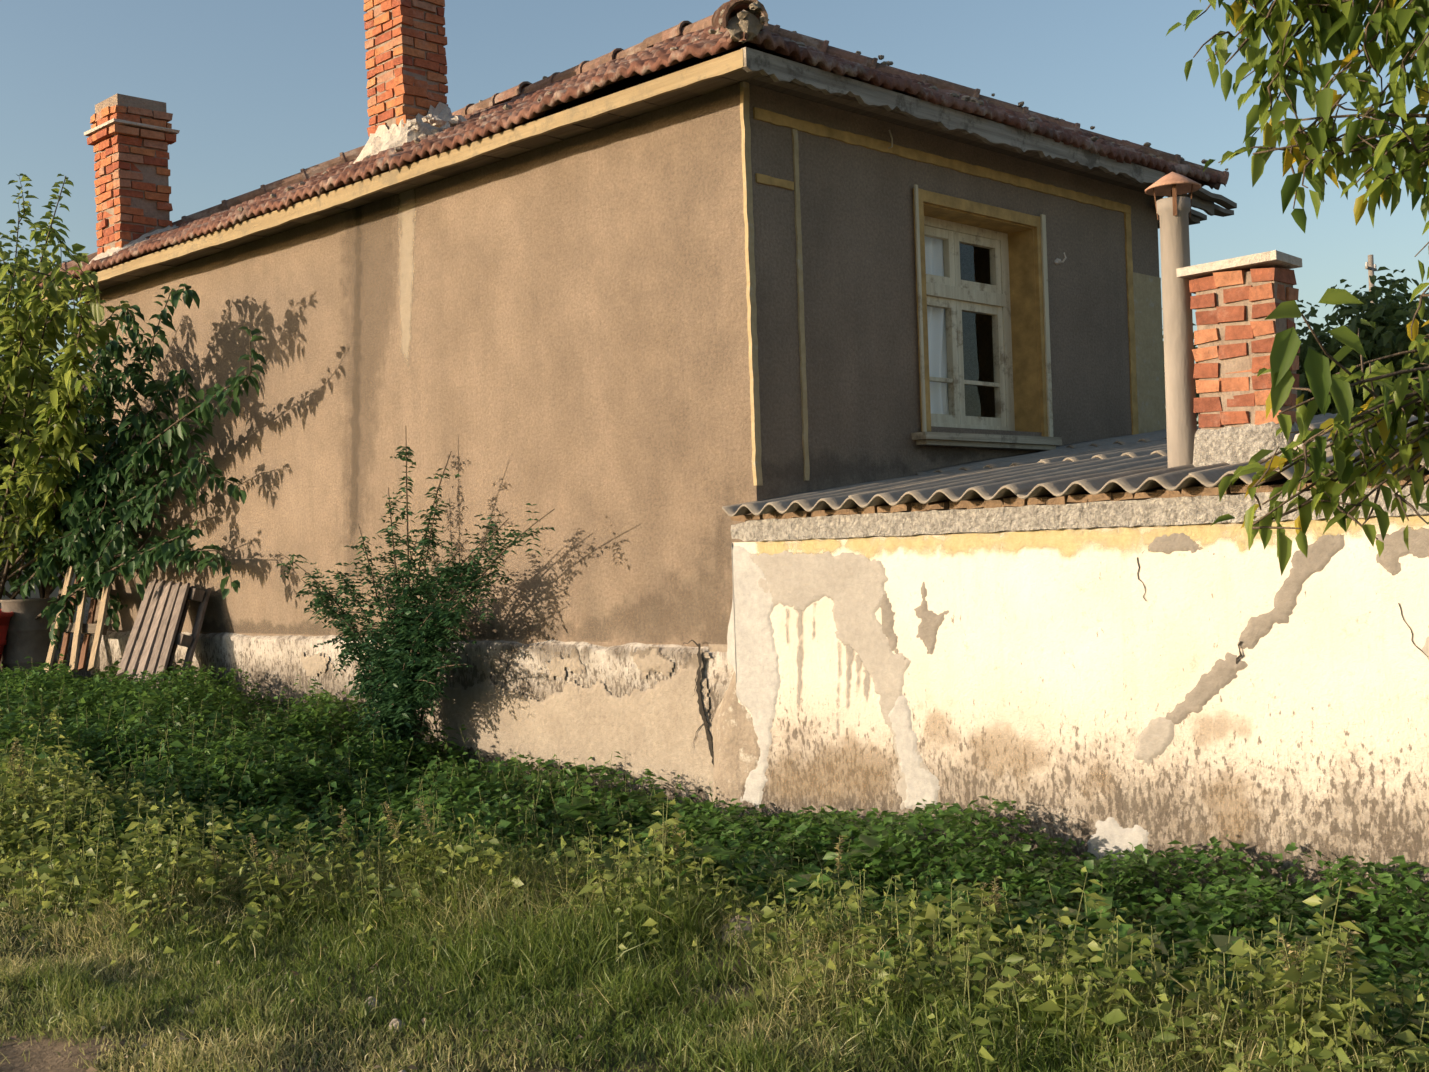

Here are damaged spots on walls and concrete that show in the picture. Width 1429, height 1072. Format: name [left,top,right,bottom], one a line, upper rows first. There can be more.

flaking render [1142,533,1225,557]
flaking render [1375,527,1429,576]
flaking render [301,652,333,676]
peeling [727,599,737,683]
flaking render [914,581,949,655]
flaking render [423,646,715,807]
crack [682,640,714,766]
peeling [888,695,941,809]
peeling [1134,717,1175,767]